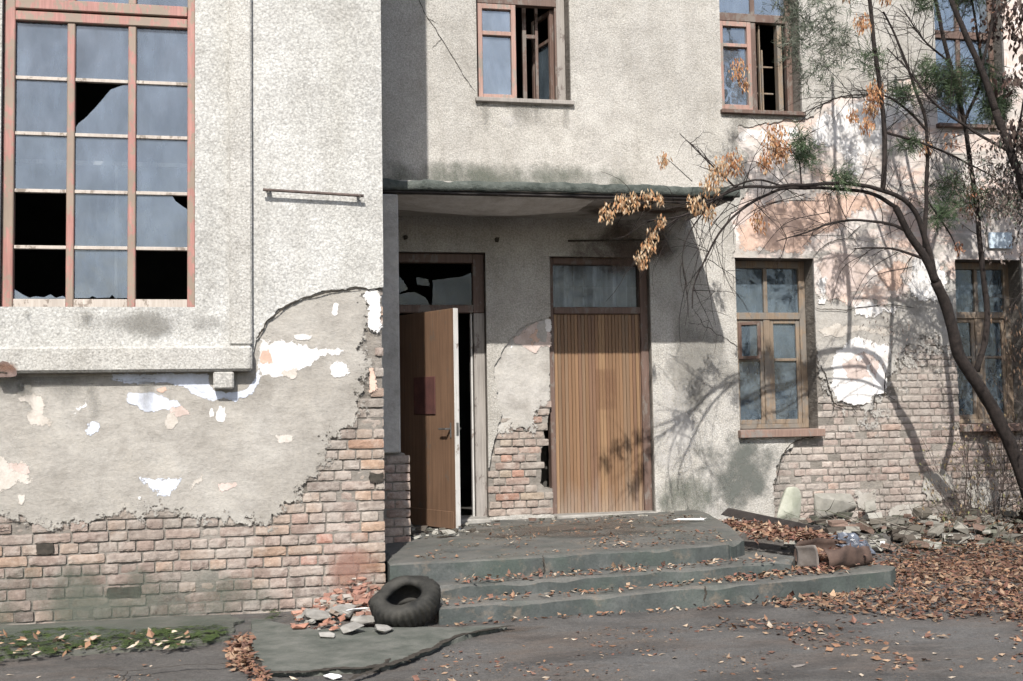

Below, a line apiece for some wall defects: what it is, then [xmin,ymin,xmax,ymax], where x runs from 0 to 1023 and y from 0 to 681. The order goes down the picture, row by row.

crack [419,0,475,91]
flaking render [731,0,1023,522]
flaking render [0,287,411,626]
flaking render [487,317,553,516]
leakage [663,345,710,464]
leakage [705,439,771,506]